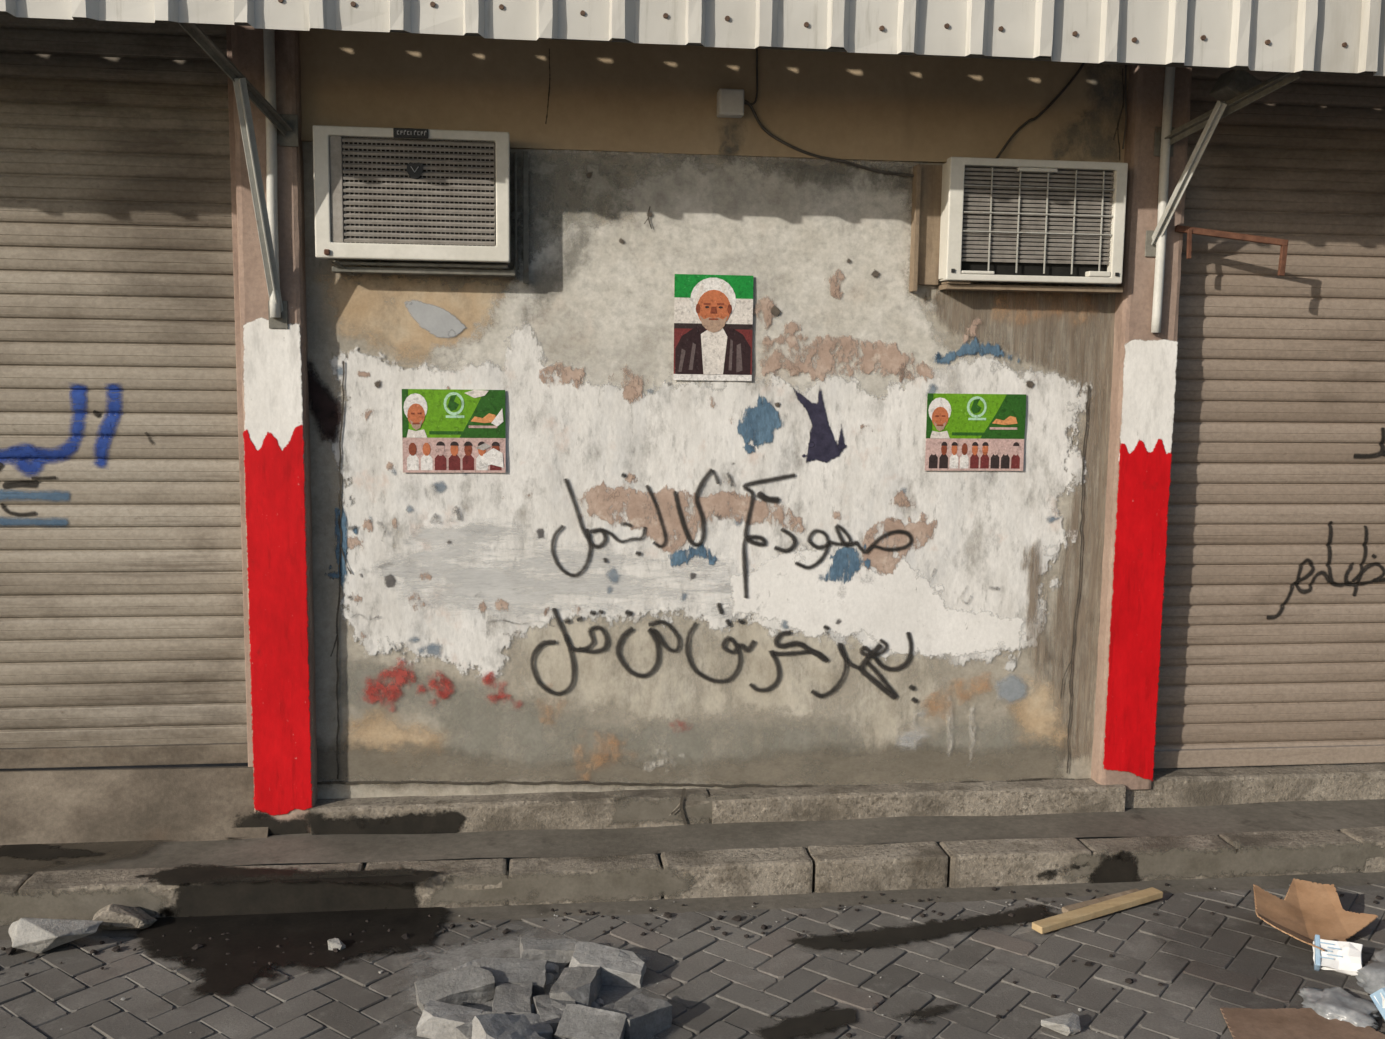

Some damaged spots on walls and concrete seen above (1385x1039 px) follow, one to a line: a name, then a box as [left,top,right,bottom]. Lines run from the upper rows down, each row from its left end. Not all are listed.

peeling [829,259,851,299]
peeling [319,261,506,368]
peeling [539,362,585,388]
peeling [621,367,652,403]
peeling [747,297,940,463]
peeling [325,519,373,580]
peeling [580,473,806,600]
peeling [861,489,937,574]
peeling [343,687,441,753]
peeling [1016,684,1066,741]
damp [228,810,466,839]
damp [135,863,450,998]